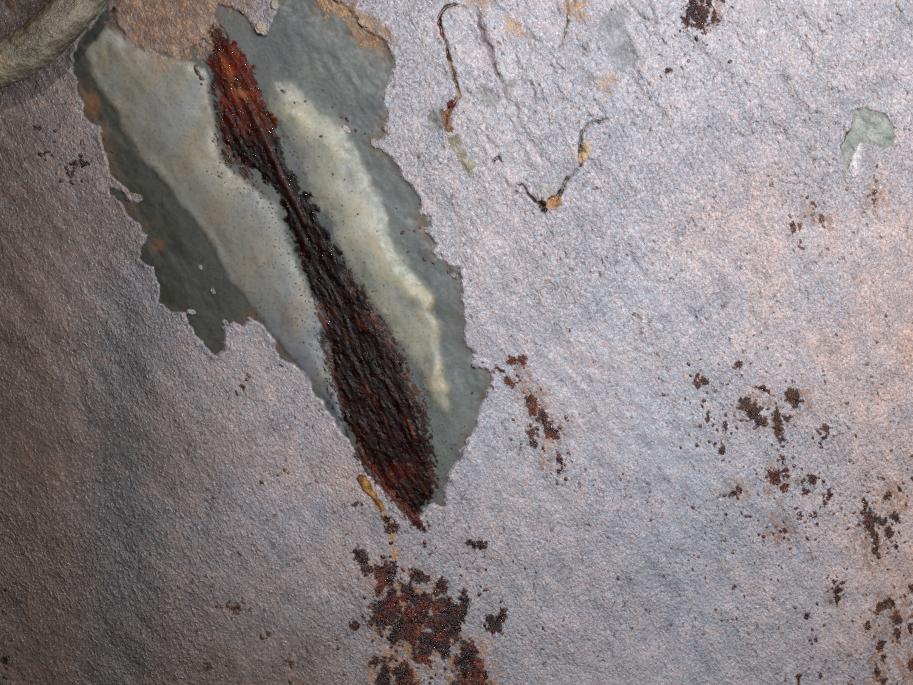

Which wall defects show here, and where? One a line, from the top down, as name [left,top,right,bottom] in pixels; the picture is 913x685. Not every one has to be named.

crack [429,3,537,174]
crack [514,119,607,213]
rust [674,0,734,46]
peeling [840,108,895,168]
peeling [73,0,493,519]
rust [104,0,512,685]
rust [482,352,602,485]
rust [684,347,839,568]
rust [825,459,913,685]